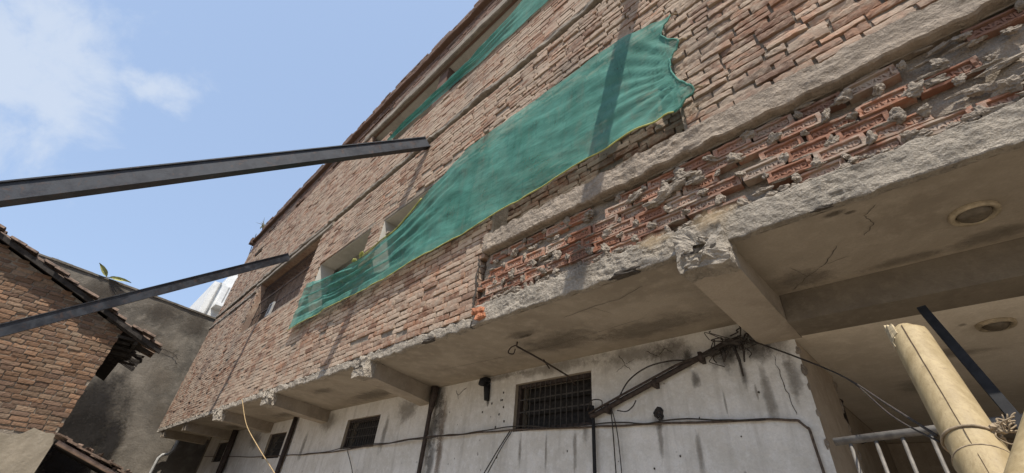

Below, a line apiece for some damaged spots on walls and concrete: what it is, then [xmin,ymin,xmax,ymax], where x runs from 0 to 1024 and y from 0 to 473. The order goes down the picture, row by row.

flaking render [471,0,1024,321]
spalling [351,355,379,382]
spalling [260,388,279,408]
spalling [212,407,229,422]